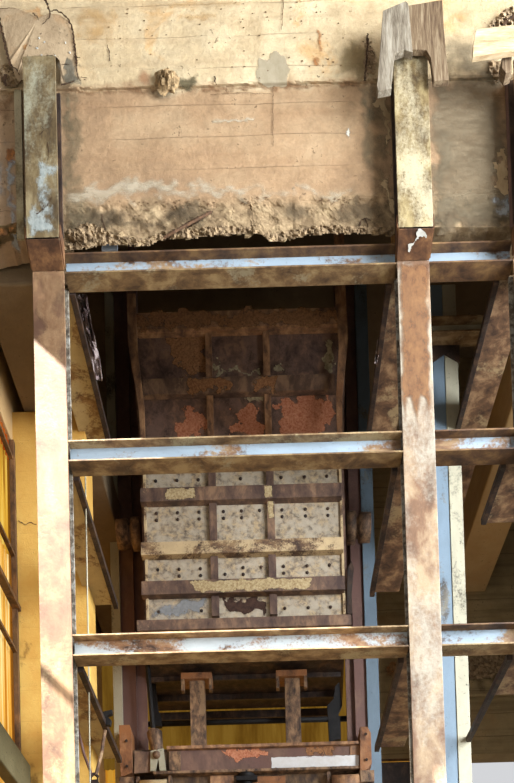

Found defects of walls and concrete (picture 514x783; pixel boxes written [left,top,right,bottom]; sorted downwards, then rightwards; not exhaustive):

spalling [0,63,22,87]
crack [210,76,274,142]
damp [432,45,507,232]
peeling [492,148,508,195]
damp [71,178,151,229]
spalling [68,199,393,250]
peeling [408,229,427,252]
corrosion [222,748,268,763]